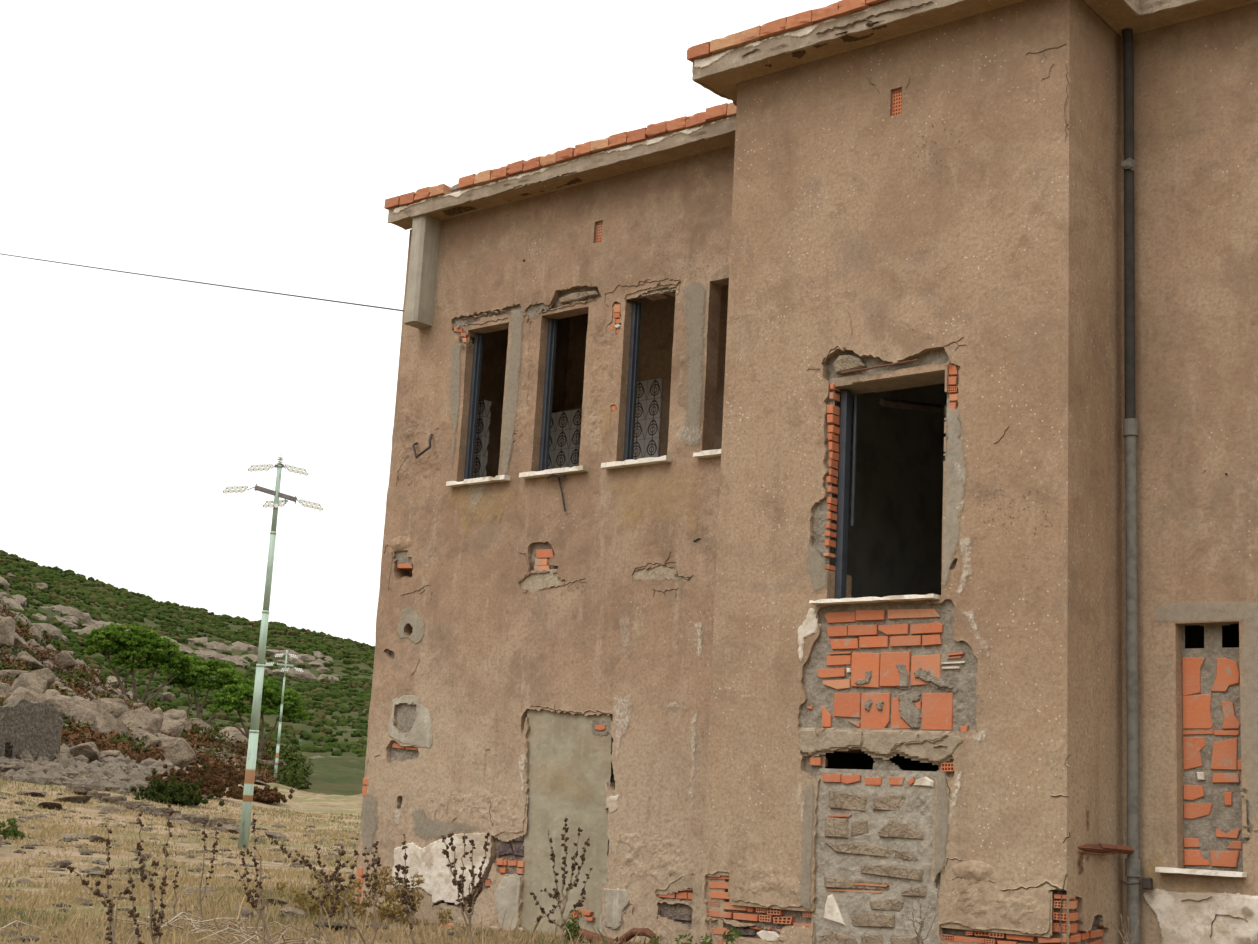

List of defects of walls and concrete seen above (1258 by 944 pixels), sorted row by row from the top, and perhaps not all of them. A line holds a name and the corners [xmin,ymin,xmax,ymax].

peeling [694,7,887,69]
flaking render [453,226,704,350]
flaking render [812,347,962,571]
flaking render [520,543,586,593]
flaking render [633,563,690,582]
flaking render [800,599,978,734]
flaking render [390,702,419,762]
flaking render [482,835,526,891]
flaking render [604,829,815,944]
flaking render [937,866,1104,944]